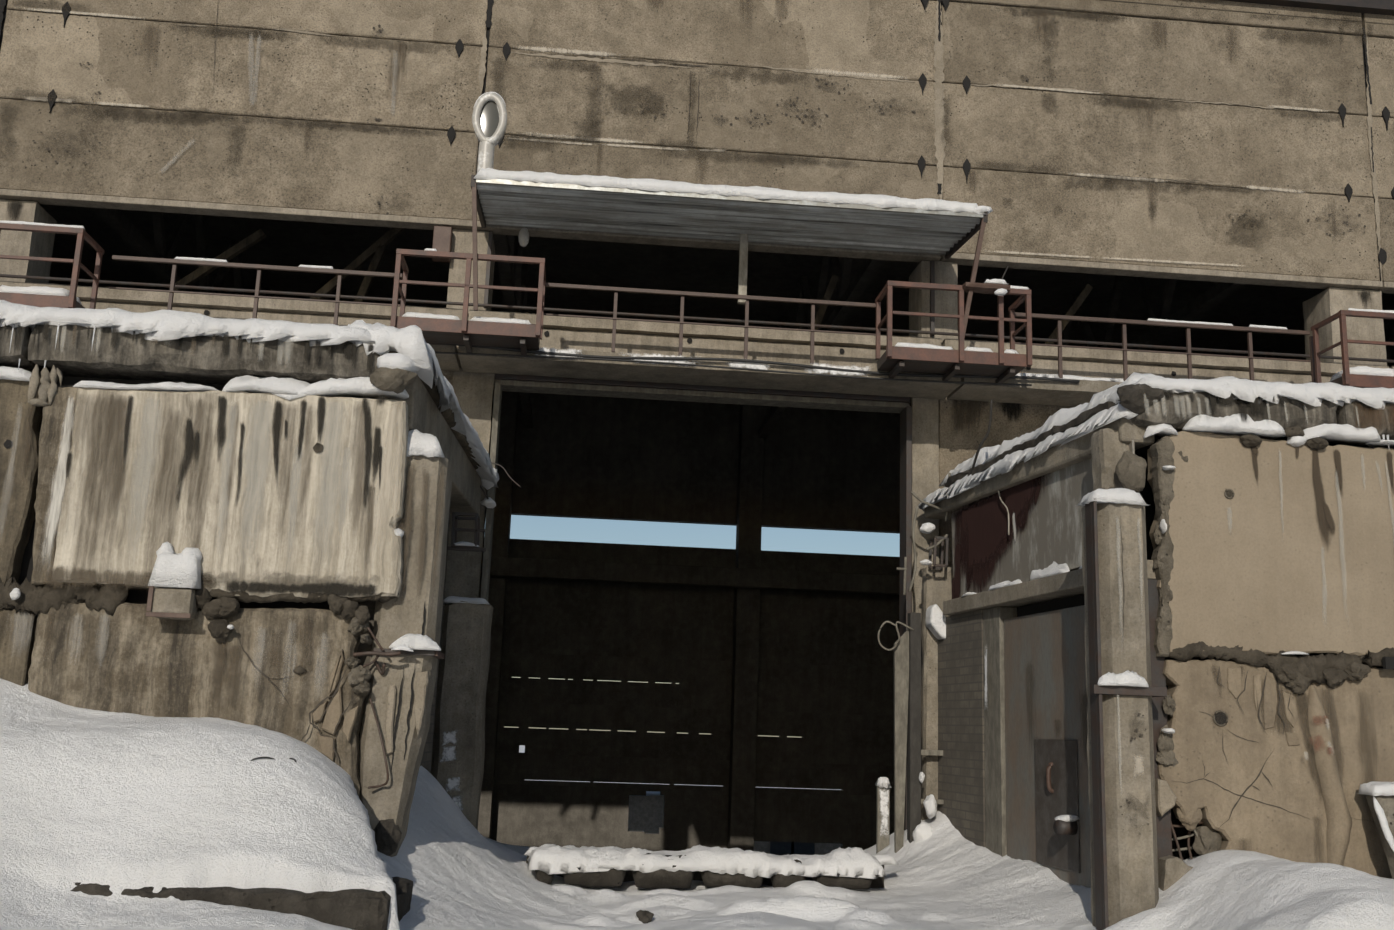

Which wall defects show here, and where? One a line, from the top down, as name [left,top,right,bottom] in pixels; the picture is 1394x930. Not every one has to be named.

water stain [123,396,133,458]
water stain [177,419,199,500]
water stain [217,396,244,503]
water stain [272,396,326,476]
water stain [1249,446,1258,480]
water stain [1296,447,1342,543]
corrosion [952,475,1045,599]
spalling [1150,436,1188,657]
spalling [1130,694,1179,772]
crack [1175,666,1309,828]
spalling [1171,821,1204,860]